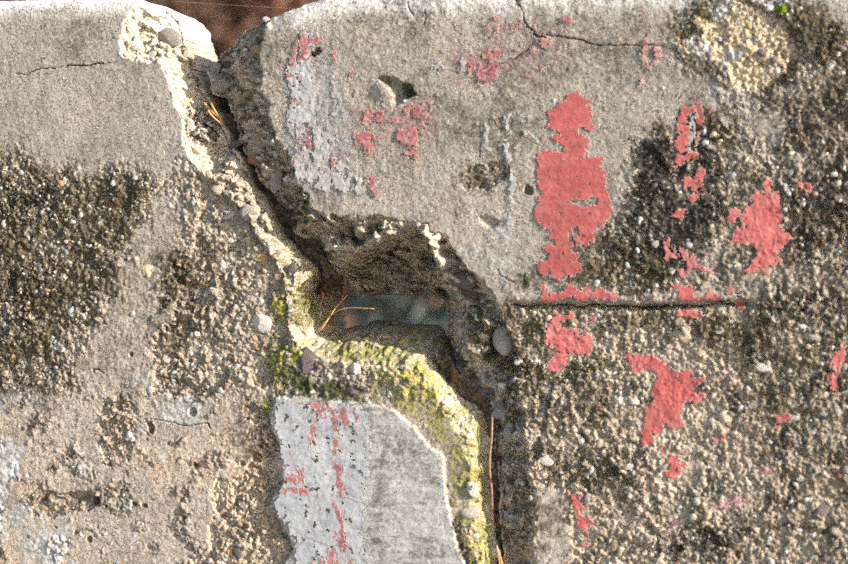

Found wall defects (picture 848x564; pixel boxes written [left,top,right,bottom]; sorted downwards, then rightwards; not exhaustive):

crack [30,63,103,73]
crack [496,1,653,67]
spalling [677,0,801,93]
peeling [519,114,547,143]
crack [225,113,344,296]
peeling [670,208,687,221]
leakage [0,141,155,418]
spalling [119,0,536,564]
crack [514,299,747,309]
leakage [452,0,848,564]
crack [436,346,508,564]